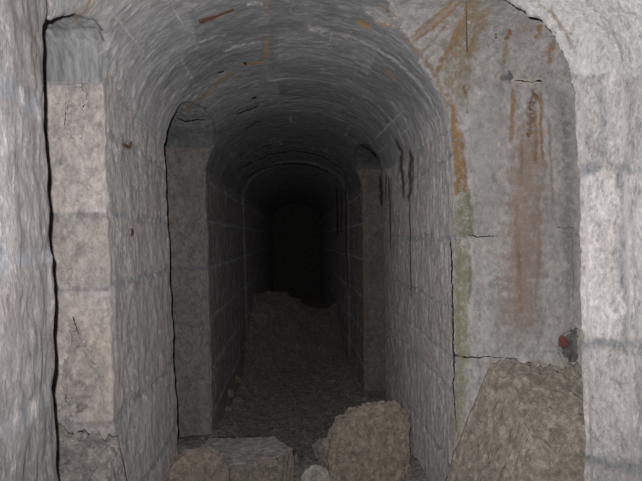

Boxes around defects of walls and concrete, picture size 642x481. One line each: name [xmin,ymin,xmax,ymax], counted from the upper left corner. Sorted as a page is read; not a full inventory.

rust [416,1,487,94]
rust [446,95,465,194]
rust [527,92,544,160]
crack [450,239,502,432]